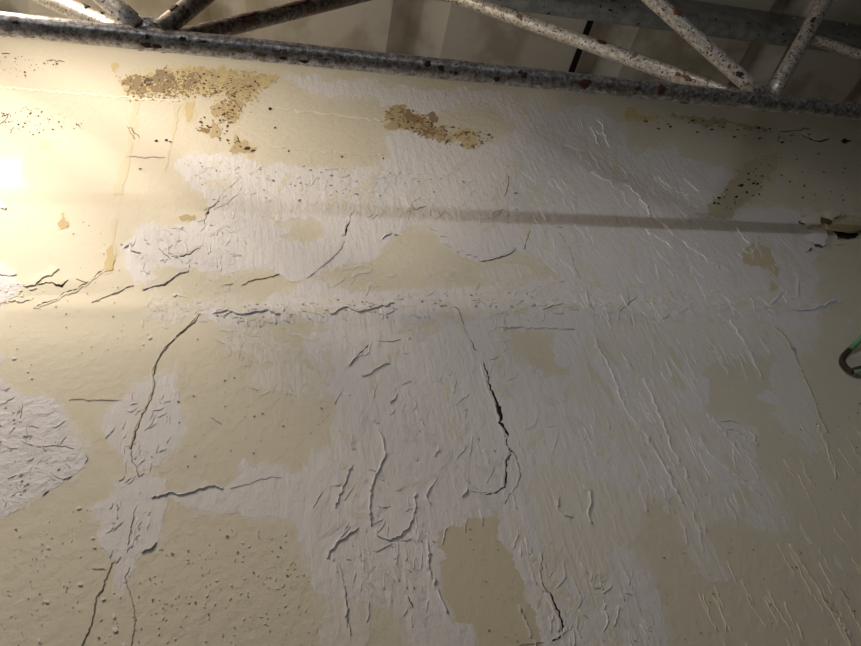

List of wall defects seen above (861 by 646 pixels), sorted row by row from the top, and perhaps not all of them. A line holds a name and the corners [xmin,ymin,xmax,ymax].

rust [111,61,281,159]
rust [381,104,479,150]
crack [2,246,199,309]
crack [129,313,200,477]
crack [453,298,524,503]
crack [81,514,139,646]
flaking render [437,513,543,646]
crack [519,553,564,646]